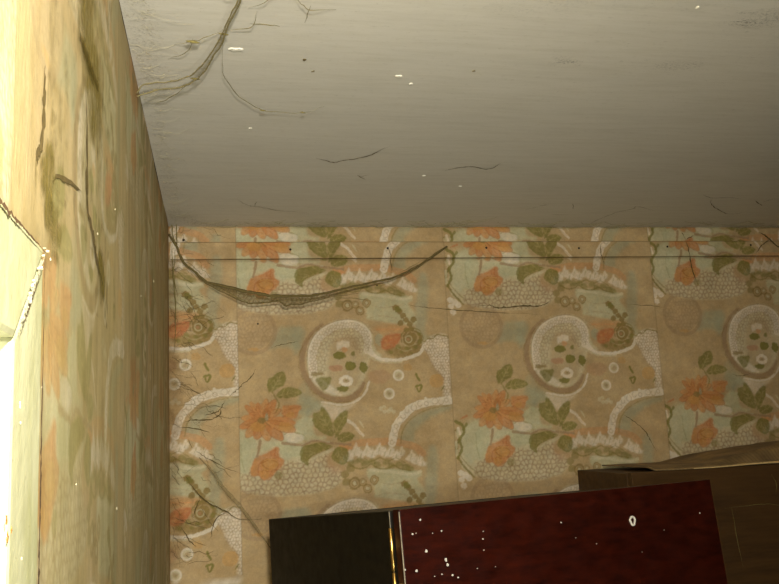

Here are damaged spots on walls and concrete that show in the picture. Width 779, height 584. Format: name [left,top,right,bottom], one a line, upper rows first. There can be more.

crack [37,71,46,164]
crack [53,102,103,284]
crack [0,198,46,253]
crack [20,272,45,335]
crack [411,302,548,314]
crack [185,370,255,432]
crack [36,370,44,584]